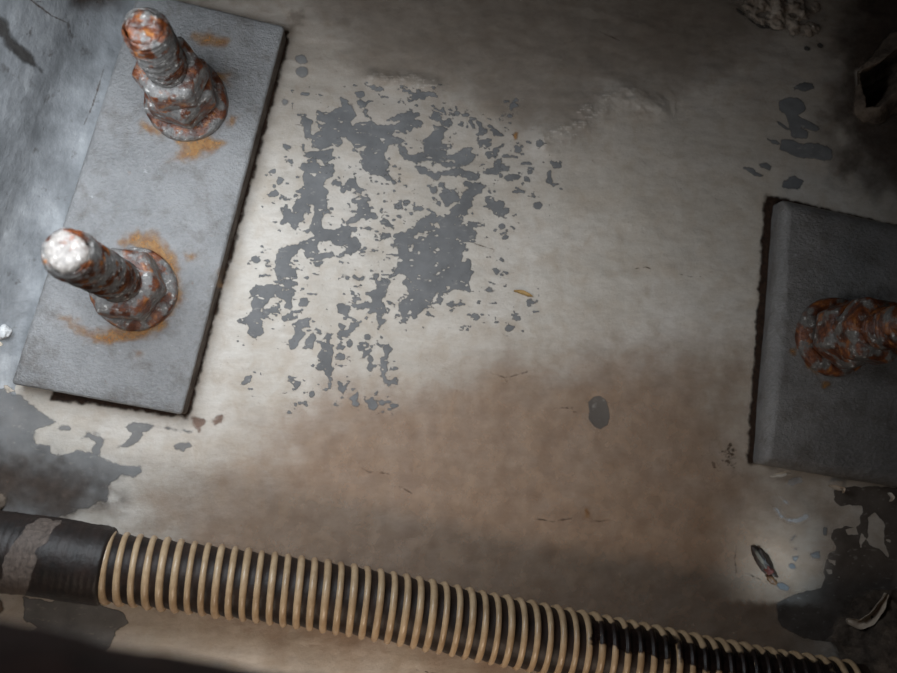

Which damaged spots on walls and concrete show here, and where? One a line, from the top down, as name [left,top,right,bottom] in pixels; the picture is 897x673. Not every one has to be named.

spalling [742,0,820,37]
peeling [767,82,833,161]
hole [854,32,897,124]
peeling [543,160,562,190]
rust [50,31,289,428]
peeling [237,82,550,414]
rust [747,196,873,464]
peeling [0,385,142,517]
peeling [121,422,153,447]
peeling [588,396,610,429]
peeling [776,484,897,642]
peeling [23,597,128,646]